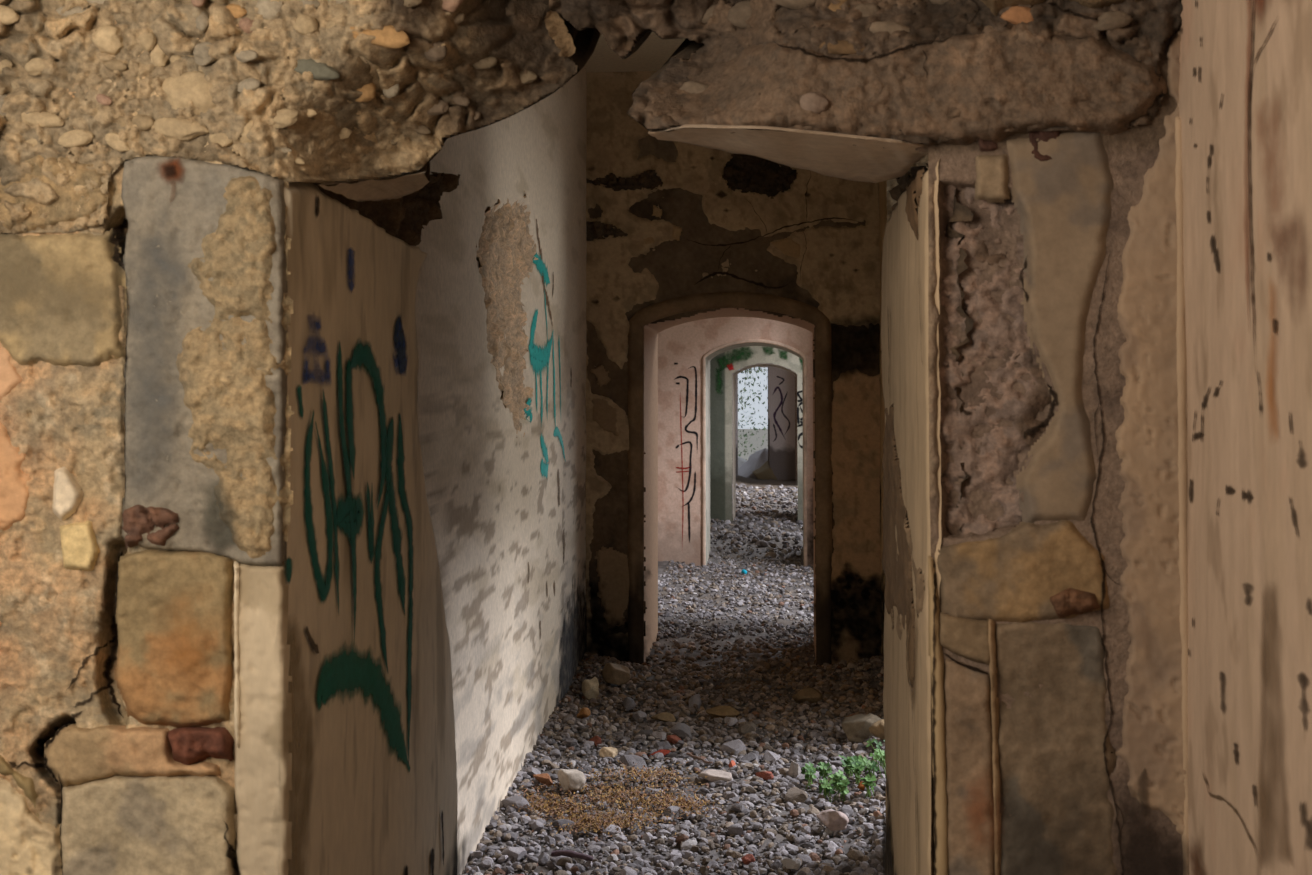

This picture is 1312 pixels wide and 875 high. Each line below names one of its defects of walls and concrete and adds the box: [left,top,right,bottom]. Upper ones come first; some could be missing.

corrosion [161,160,183,192]
spalling [0,0,1196,566]
crack [687,170,860,289]
spalling [1207,211,1219,273]
spalling [1192,381,1221,442]
crack [8,218,128,868]
flaking render [570,320,647,636]
flaking render [882,404,925,686]
spalling [1216,486,1252,515]
water stain [811,564,885,661]
spalling [1298,673,1307,730]
spalling [1299,802,1312,849]